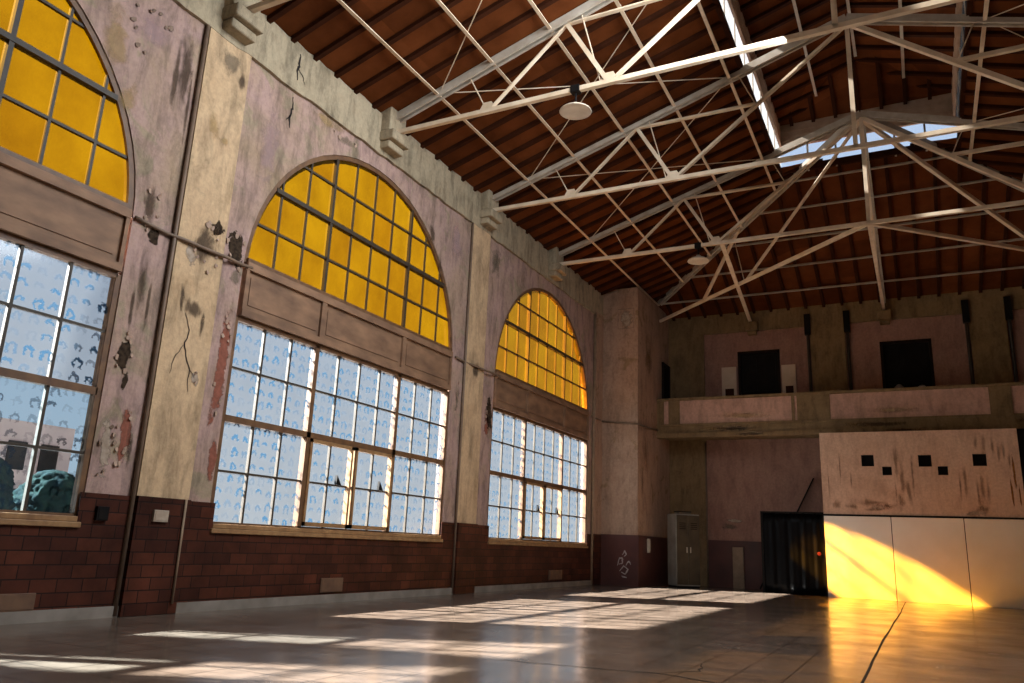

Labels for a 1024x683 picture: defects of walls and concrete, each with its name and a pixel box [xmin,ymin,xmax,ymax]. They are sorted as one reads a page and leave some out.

leakage [129,272,151,323]
leakage [180,289,204,333]